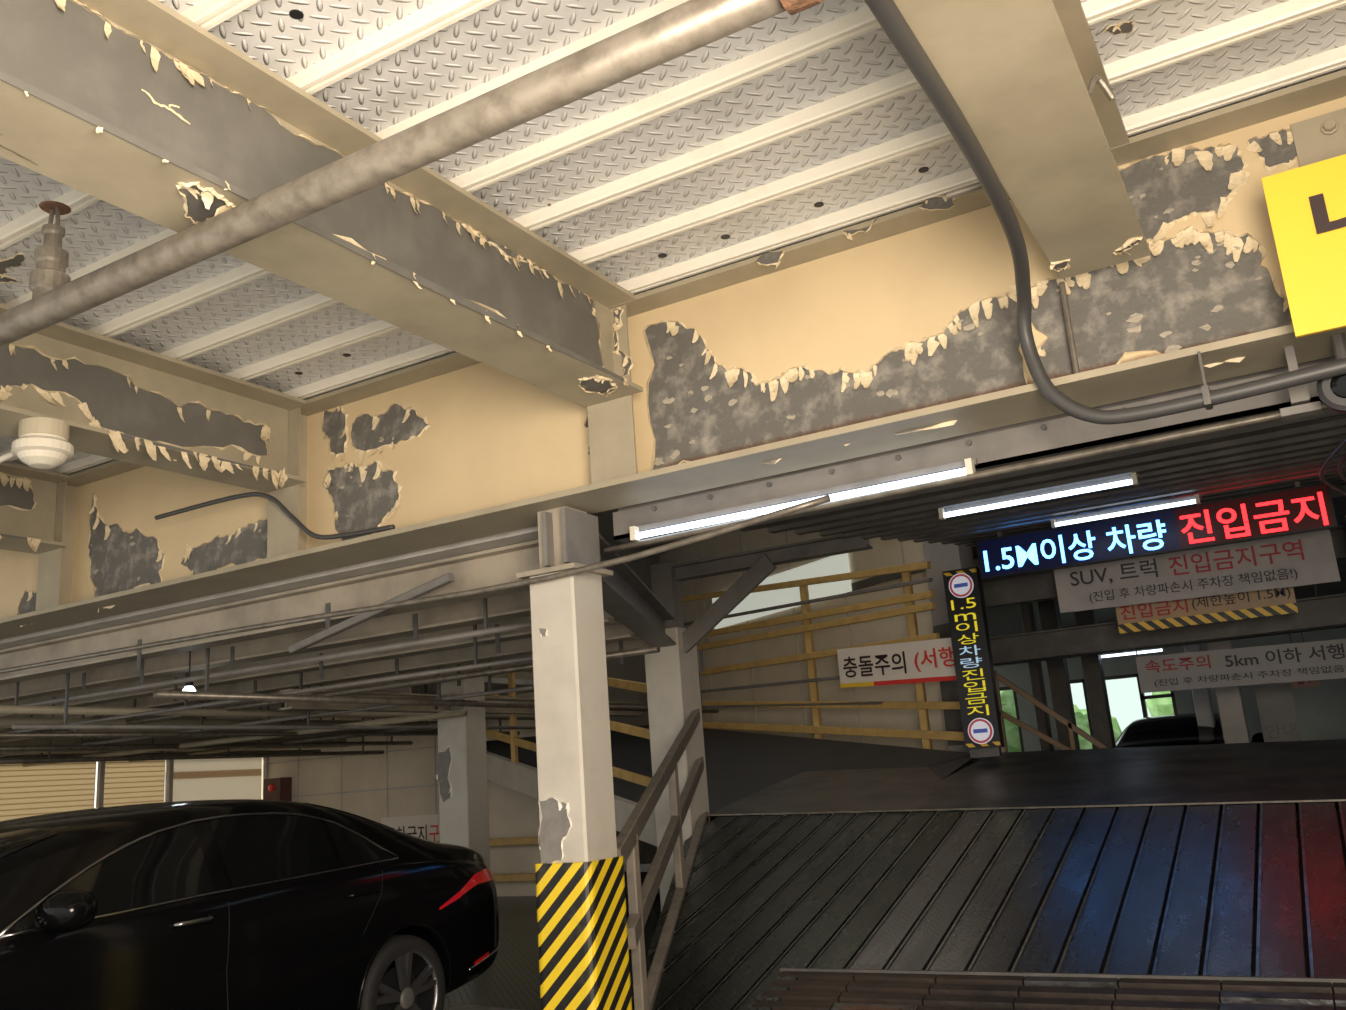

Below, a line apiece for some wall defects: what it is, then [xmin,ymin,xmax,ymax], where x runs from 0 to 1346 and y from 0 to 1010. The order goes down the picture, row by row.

peeling [0,0,345,225]
peeling [0,253,26,283]
peeling [293,182,633,397]
peeling [643,128,1297,486]
peeling [0,472,37,511]
peeling [0,534,41,552]
peeling [0,344,288,490]
peeling [87,492,268,612]
peeling [321,403,432,541]